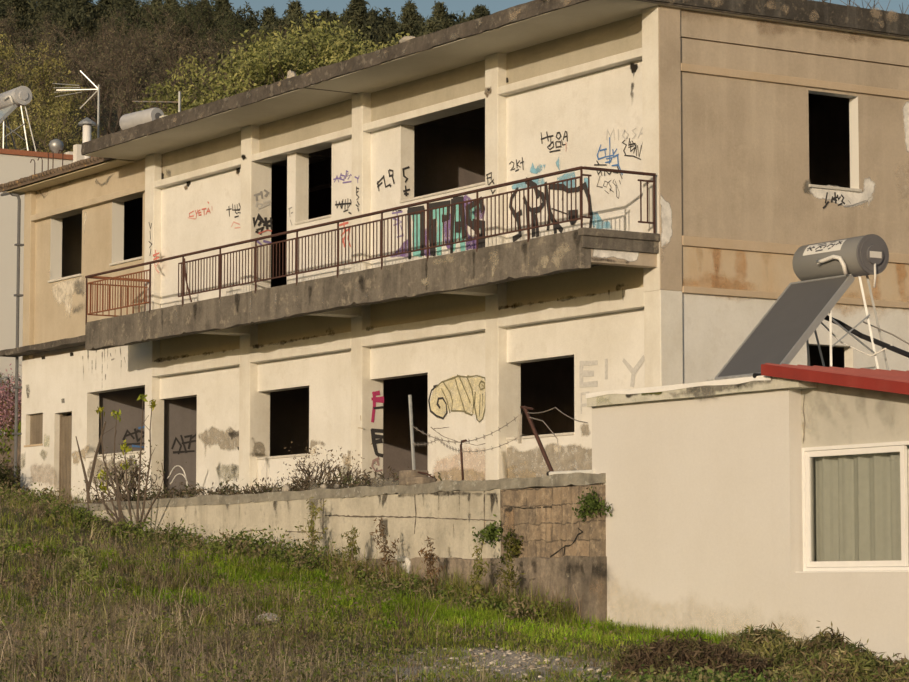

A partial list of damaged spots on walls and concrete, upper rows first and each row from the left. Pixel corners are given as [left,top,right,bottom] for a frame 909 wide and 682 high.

peeling [804,178,875,207]
peeling [660,196,672,247]
peeling [53,277,85,313]
peeling [199,427,239,450]
peeling [507,444,592,478]